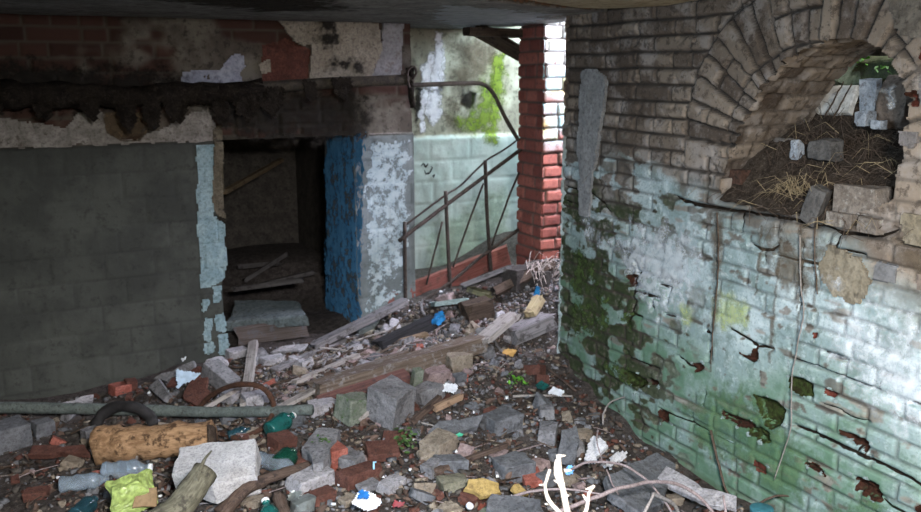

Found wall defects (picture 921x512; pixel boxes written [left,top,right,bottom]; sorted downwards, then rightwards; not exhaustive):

spalling [258,38,311,81]
damp [103,112,149,142]
damp [485,53,505,145]
spalling [854,110,877,127]
spalling [904,90,919,107]
peeling [323,133,413,322]
damp [619,226,690,306]
damp [712,215,723,273]
damp [757,230,824,293]
spalling [720,394,788,445]
crack [797,425,921,486]
spalling [848,472,884,503]